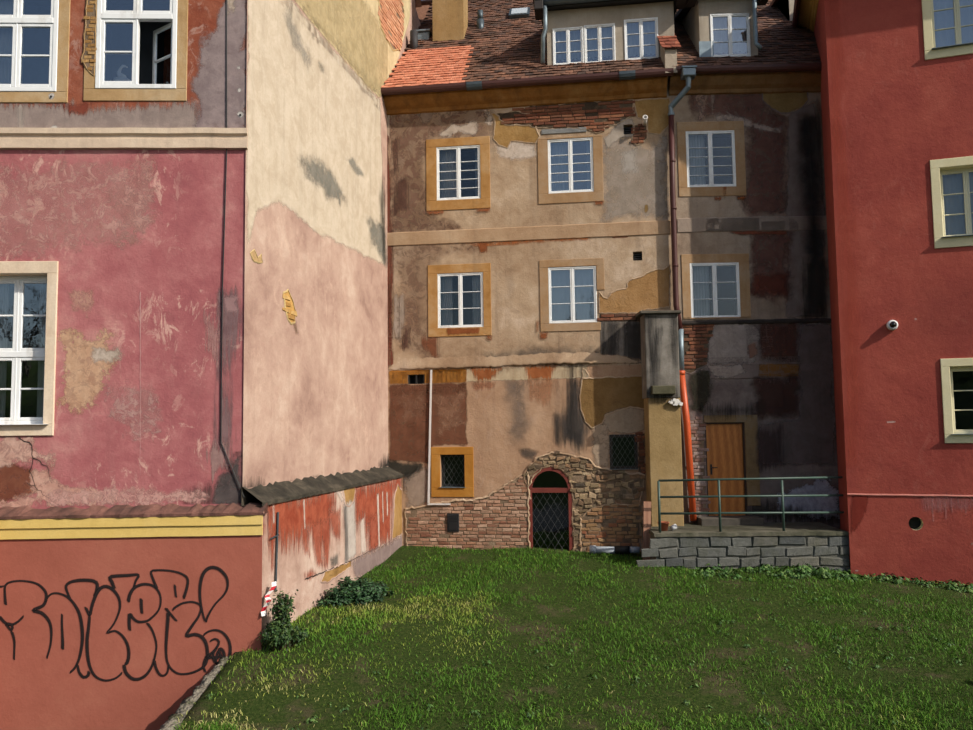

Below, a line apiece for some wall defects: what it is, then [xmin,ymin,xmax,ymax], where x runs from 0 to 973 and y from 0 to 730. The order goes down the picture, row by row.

flaking render [378,0,405,51]
flaking render [440,98,671,172]
water stain [301,159,342,204]
spalling [597,264,672,322]
peeling [56,328,161,440]
water stain [466,351,589,446]
peeling [0,436,209,508]
flaking render [375,368,646,552]
spalling [320,559,352,583]